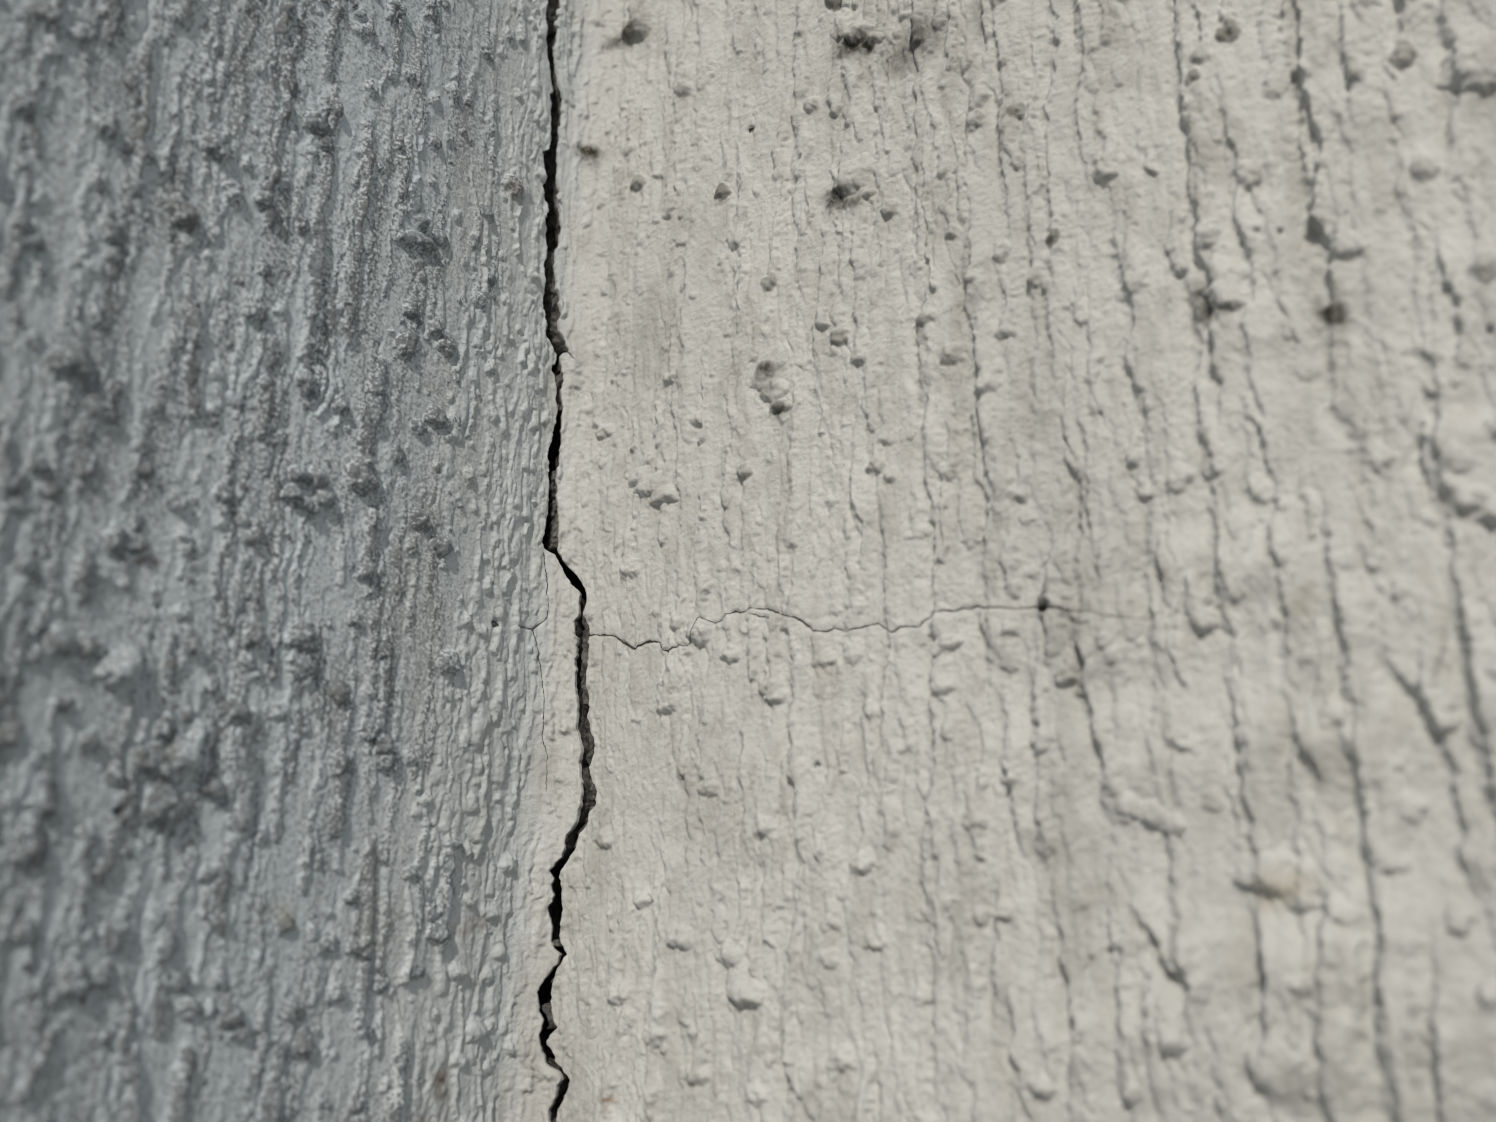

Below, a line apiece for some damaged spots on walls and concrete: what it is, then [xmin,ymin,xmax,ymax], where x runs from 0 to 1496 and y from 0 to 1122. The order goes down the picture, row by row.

crack [519,0,1161,1122]